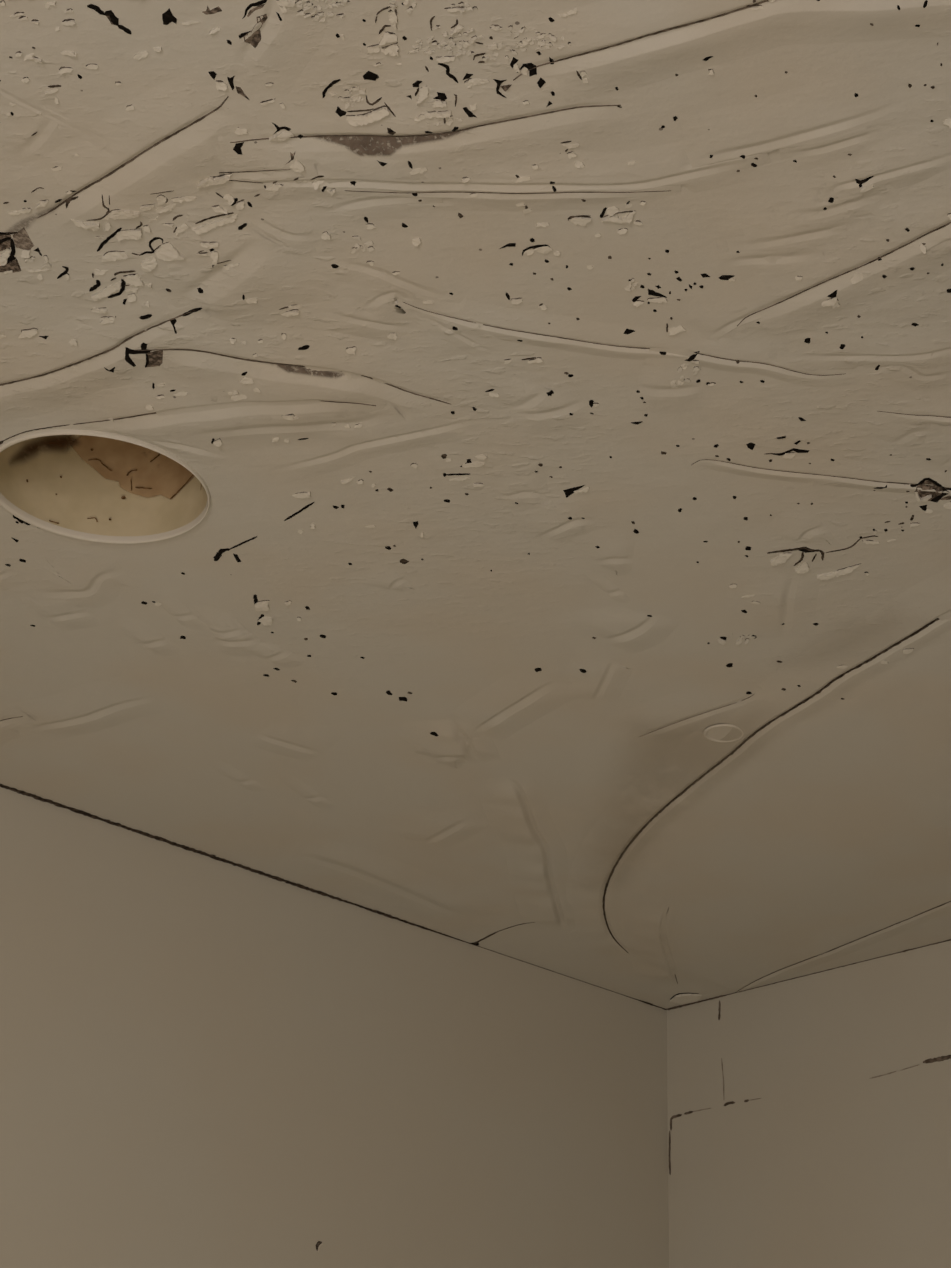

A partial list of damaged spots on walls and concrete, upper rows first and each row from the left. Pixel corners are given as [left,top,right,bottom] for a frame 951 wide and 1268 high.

peeling [0,0,132,34]
peeling [162,6,222,34]
peeling [239,0,350,48]
peeling [44,50,98,104]
peeling [208,71,285,109]
peeling [322,0,577,133]
peeling [0,123,335,324]
crack [879,410,951,418]
crack [0,459,951,1020]
crack [869,1055,951,1079]
crack [668,1058,761,1175]